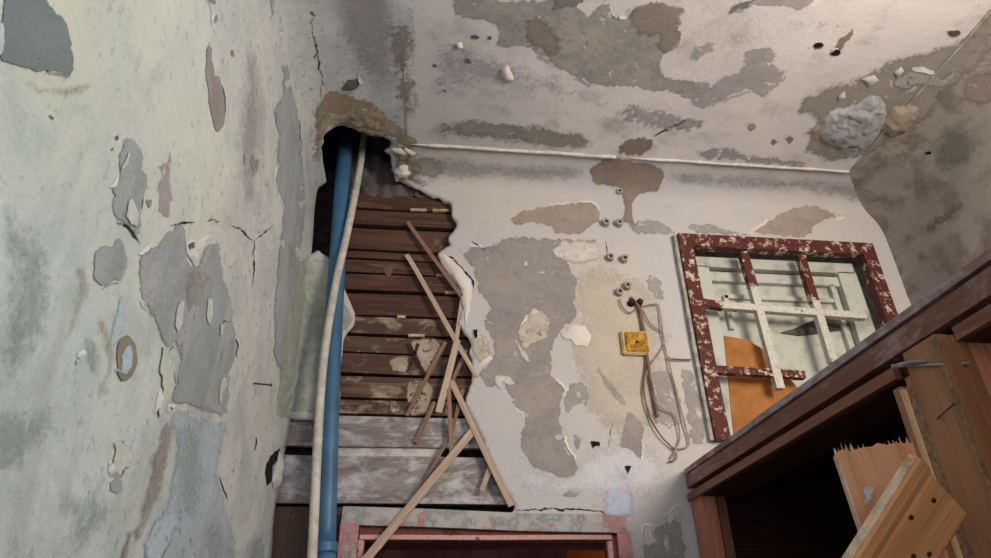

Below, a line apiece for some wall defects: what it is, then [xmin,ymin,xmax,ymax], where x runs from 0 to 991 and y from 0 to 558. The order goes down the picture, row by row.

peeling [0,0,74,79]
crack [311,22,323,84]
peeling [453,0,785,108]
peeling [734,0,813,13]
peeling [862,67,956,94]
peeling [110,135,152,236]
crack [172,219,271,286]
flaking render [336,113,426,186]
peeling [629,220,674,234]
peeling [688,205,845,238]
peeling [439,200,600,478]
peeling [139,222,240,558]